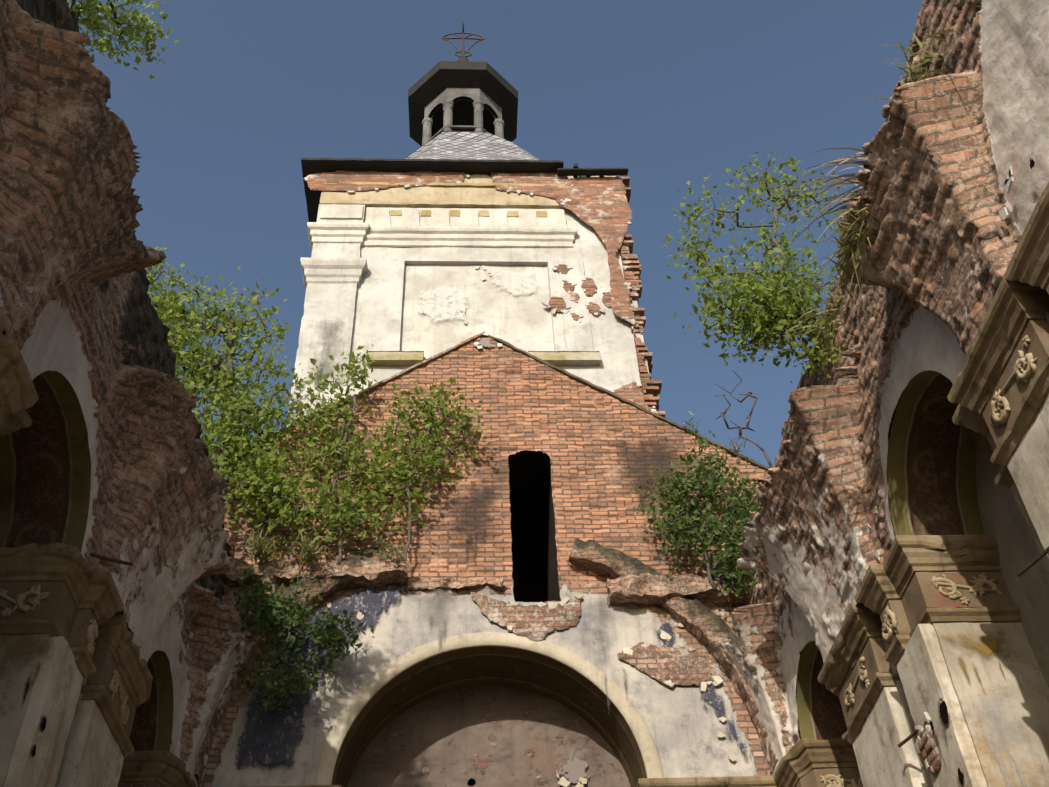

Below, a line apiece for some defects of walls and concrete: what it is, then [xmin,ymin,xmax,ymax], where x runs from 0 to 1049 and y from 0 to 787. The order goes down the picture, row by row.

spalling [303,171,470,194]
spalling [473,172,665,418]
spalling [471,592,583,641]
spalling [617,622,748,762]
peeling [552,752,592,787]
spalling [914,698,948,776]